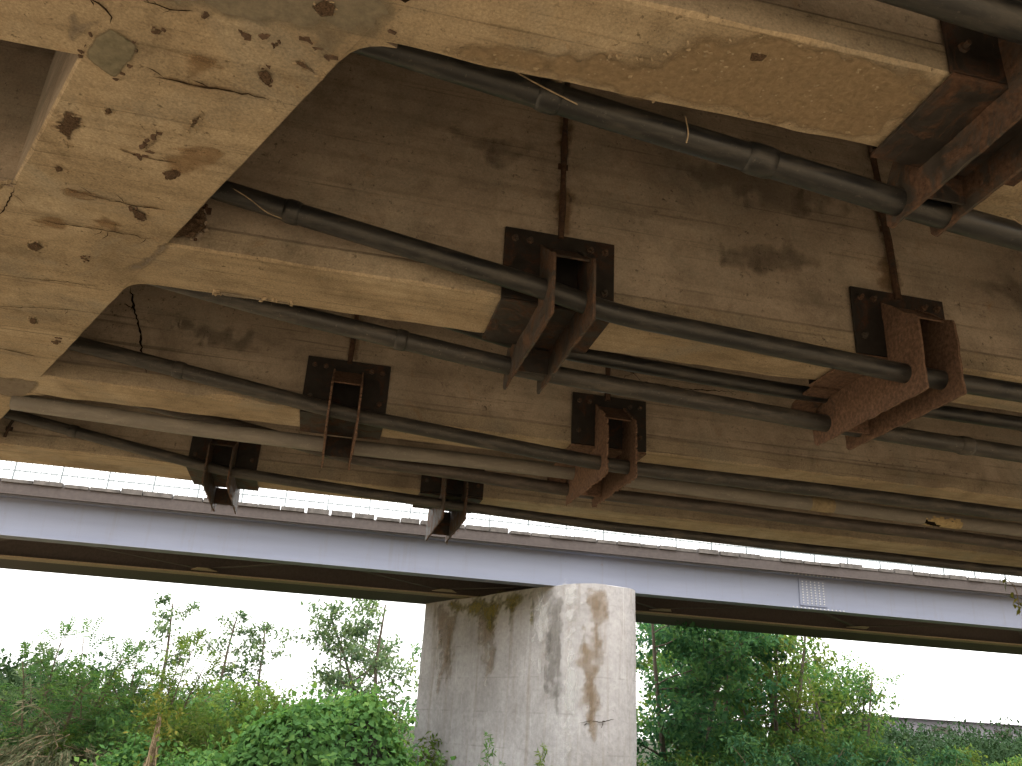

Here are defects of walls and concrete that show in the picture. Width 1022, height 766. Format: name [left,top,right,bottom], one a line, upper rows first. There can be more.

crack [90,0,113,23]
spalling [312,0,338,17]
spalling [258,65,273,87]
spalling [49,111,85,149]
corrosion [557,117,572,239]
spalling [128,206,147,221]
corrosion [876,211,902,300]
crack [125,287,147,371]
damp [530,587,598,711]